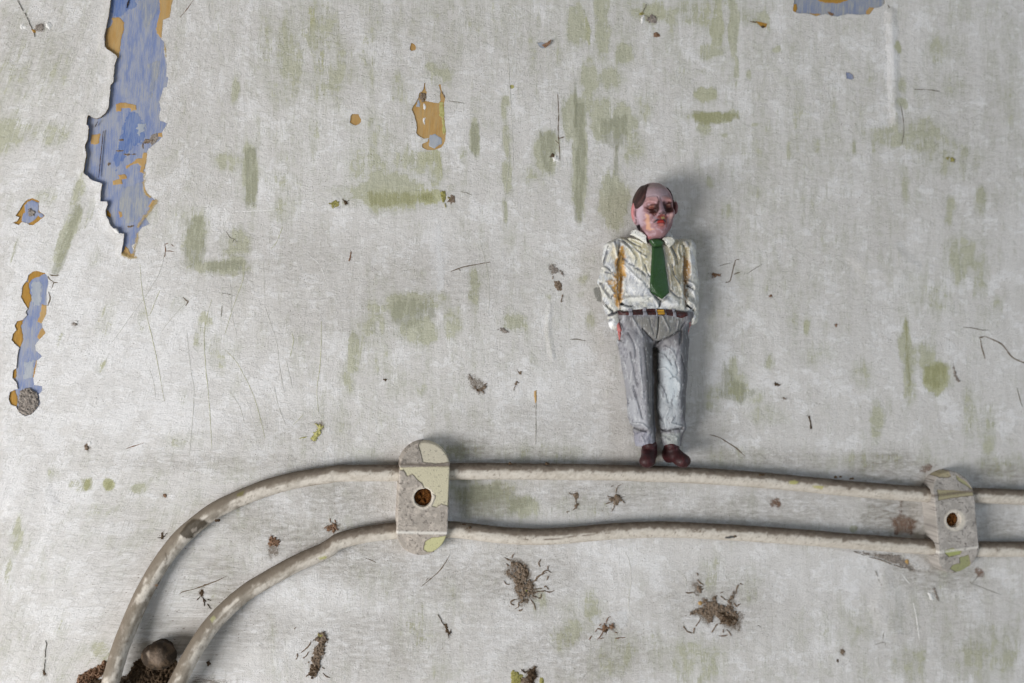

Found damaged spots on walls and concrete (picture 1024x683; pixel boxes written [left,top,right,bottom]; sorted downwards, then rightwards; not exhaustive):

peeling [793,0,884,17]
peeling [84,0,173,260]
peeling [412,83,465,150]
peeling [14,198,45,225]
peeling [9,271,59,416]